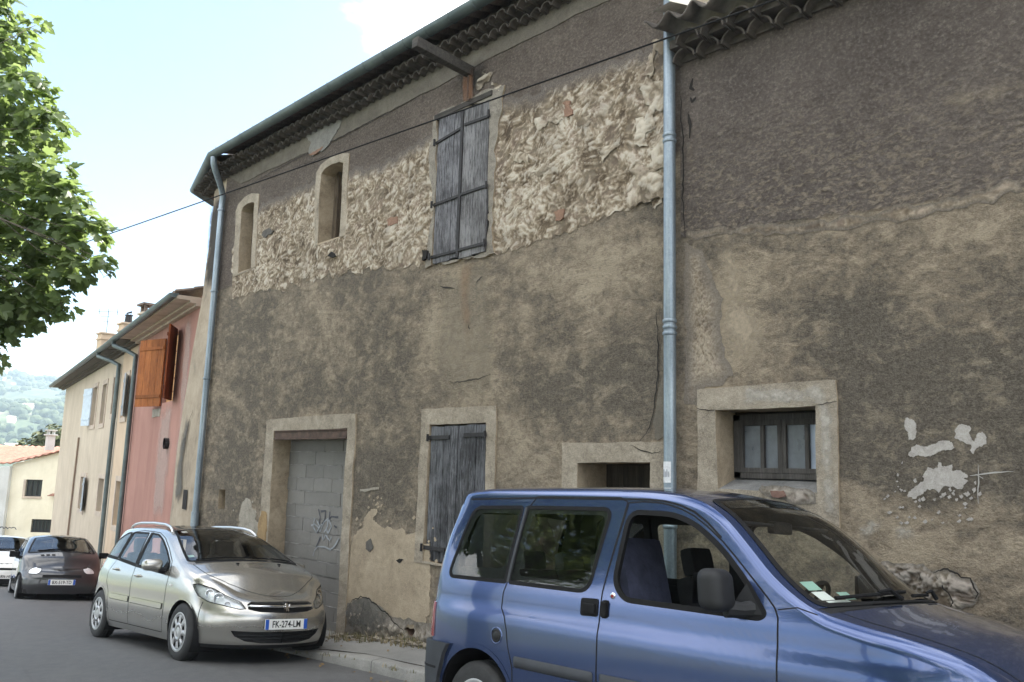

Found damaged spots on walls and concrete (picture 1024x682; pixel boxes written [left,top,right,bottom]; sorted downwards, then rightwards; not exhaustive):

flaking render [231,133,442,299]
flaking render [476,39,663,257]
crack [680,78,696,231]
crack [632,312,660,454]
flaking render [883,417,987,525]
flaking render [347,495,438,636]
flaking render [881,561,980,610]